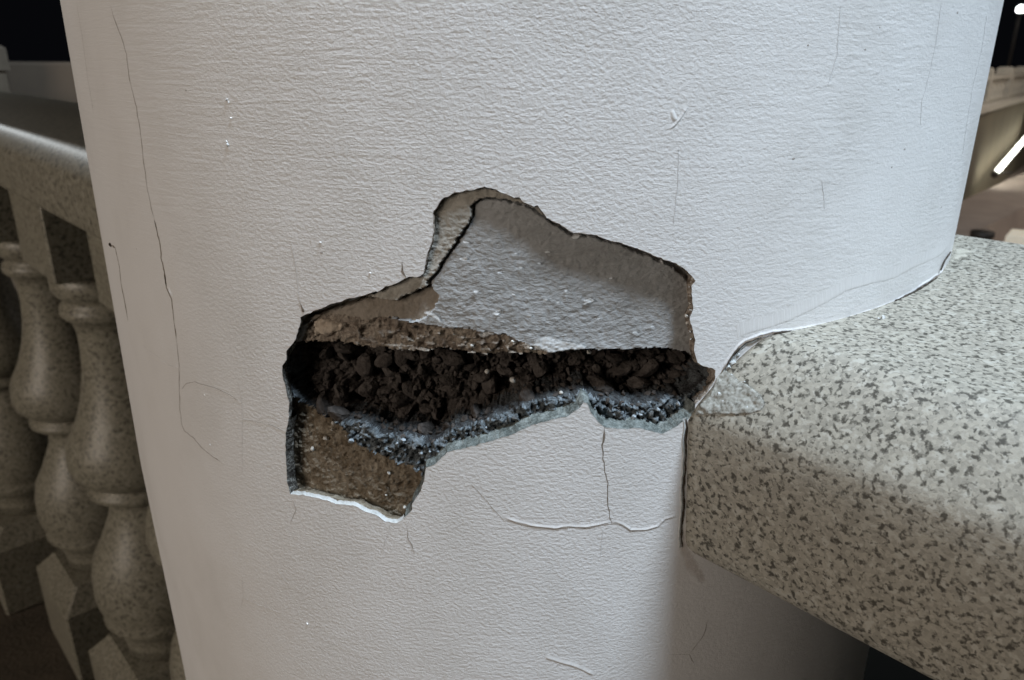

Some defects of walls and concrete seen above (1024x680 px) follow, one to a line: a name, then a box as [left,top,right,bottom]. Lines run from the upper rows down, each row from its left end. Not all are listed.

crack [111,9,281,473]
flaking render [282,187,715,523]
crack [471,418,688,548]
crack [720,251,951,372]